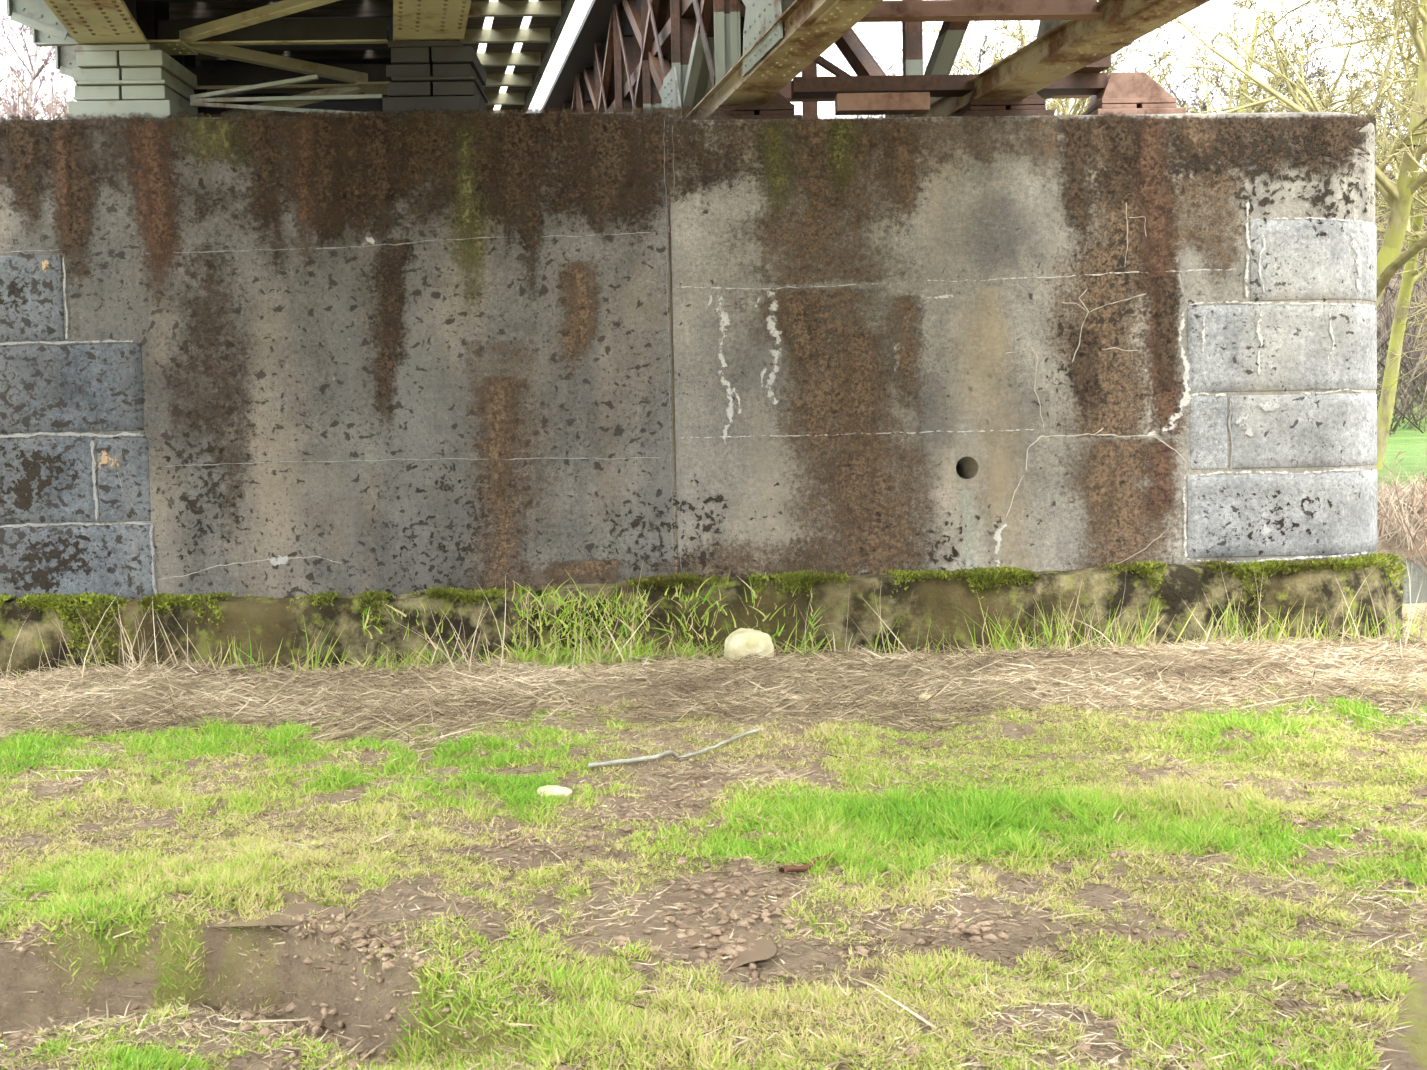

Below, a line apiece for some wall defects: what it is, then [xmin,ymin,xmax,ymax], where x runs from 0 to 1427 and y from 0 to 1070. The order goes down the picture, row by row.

water stain [0,106,1376,591]
crack [1004,347,1188,520]
crack [1062,289,1145,362]
crack [1125,203,1147,262]
rust [1139,159,1185,435]